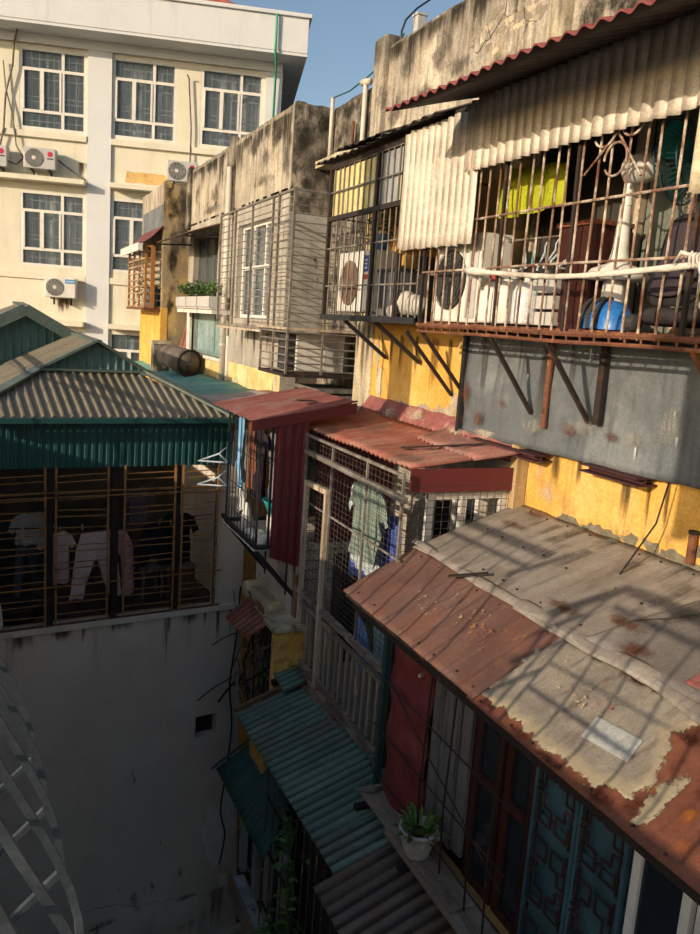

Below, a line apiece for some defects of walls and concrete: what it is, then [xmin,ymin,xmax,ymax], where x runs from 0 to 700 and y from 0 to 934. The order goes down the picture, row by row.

water stain [390,0,486,70]
water stain [580,0,638,24]
water stain [194,114,342,213]
peeling [481,638,700,829]
peeling [200,792,235,890]
rust [625,799,645,816]